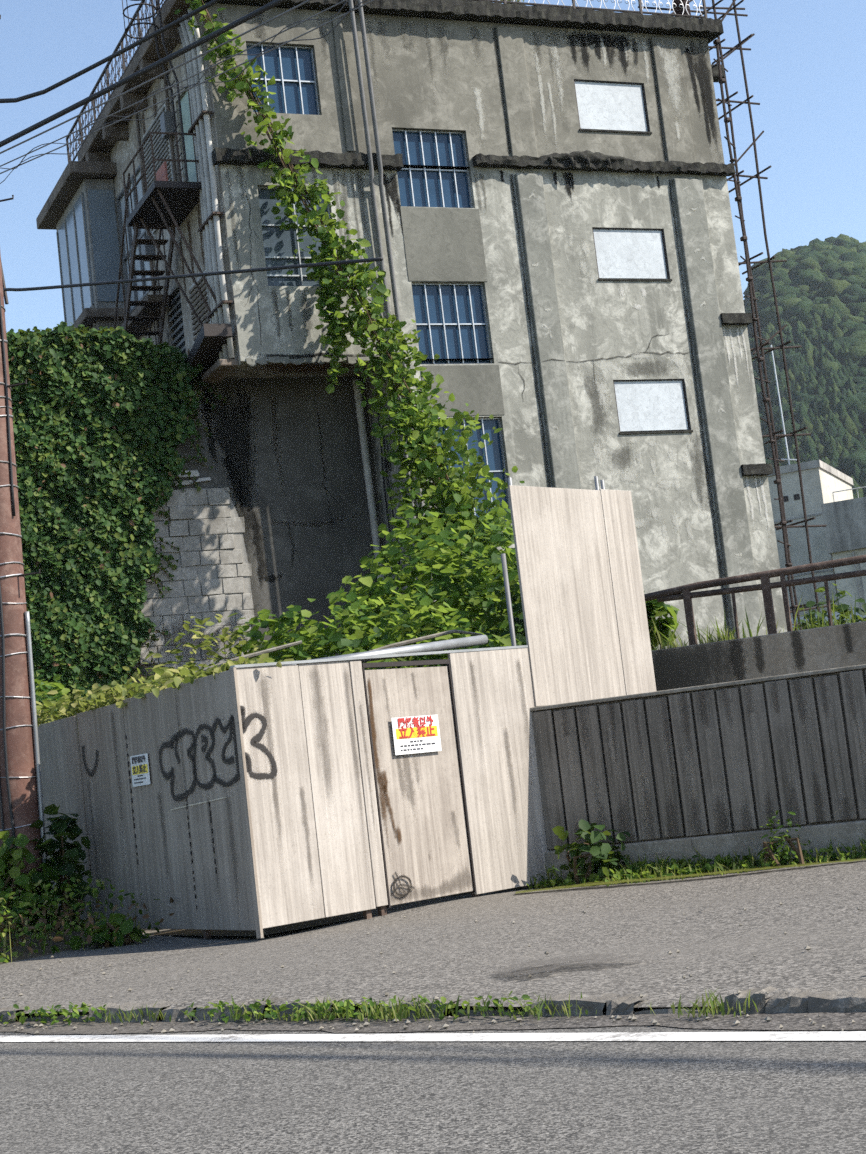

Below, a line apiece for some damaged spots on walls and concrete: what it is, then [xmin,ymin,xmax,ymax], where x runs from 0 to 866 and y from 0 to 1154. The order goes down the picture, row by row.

leakage [474,89,483,130]
leakage [536,47,563,132]
leakage [565,32,665,156]
leakage [685,44,717,143]
crack [500,333,690,402]
leakage [652,306,764,691]
leakage [791,631,804,668]
leakage [843,624,853,653]
corrosion [368,680,402,842]